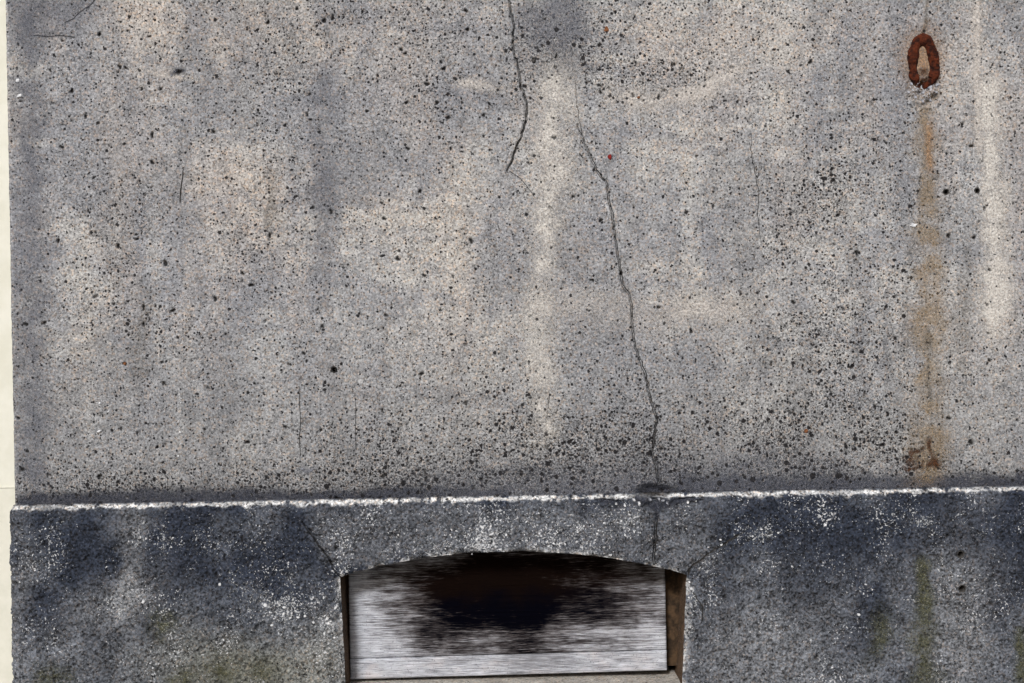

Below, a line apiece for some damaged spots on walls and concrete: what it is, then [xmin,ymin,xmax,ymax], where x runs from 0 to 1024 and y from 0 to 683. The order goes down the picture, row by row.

rust [917,46,930,85]
crack [507,0,535,197]
crack [575,81,660,483]
rust [905,440,939,472]
crack [651,519,659,565]